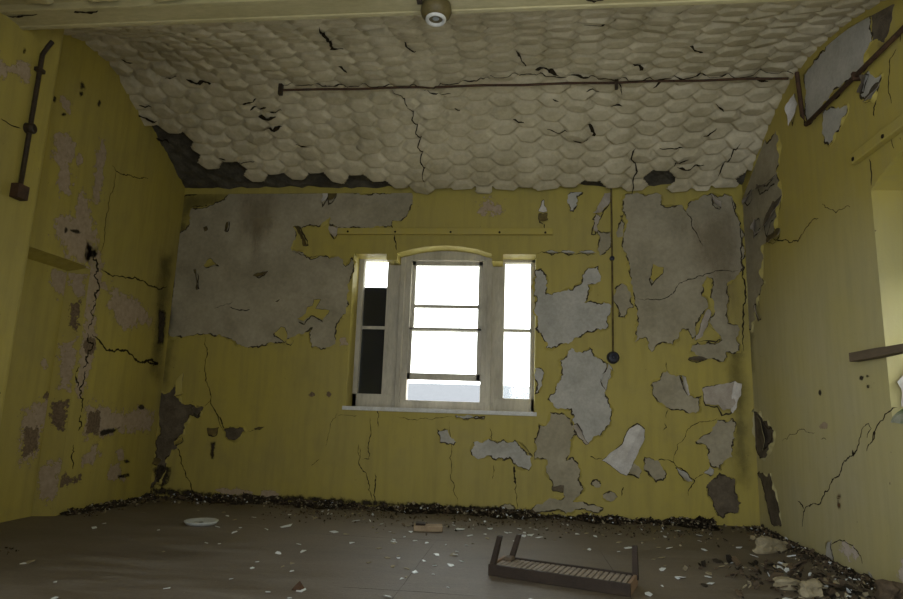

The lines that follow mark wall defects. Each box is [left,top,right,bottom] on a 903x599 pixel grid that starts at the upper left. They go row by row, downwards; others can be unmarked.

crack [6,10,98,18]
spalling [17,131,204,506]
crack [92,335,158,366]
crack [101,167,166,290]
crack [168,76,211,85]
crack [242,99,282,132]
peeling [168,193,416,350]
crack [284,27,793,181]
crack [630,148,638,193]
peeling [785,16,884,147]
peeling [207,425,263,459]
crack [798,407,897,525]